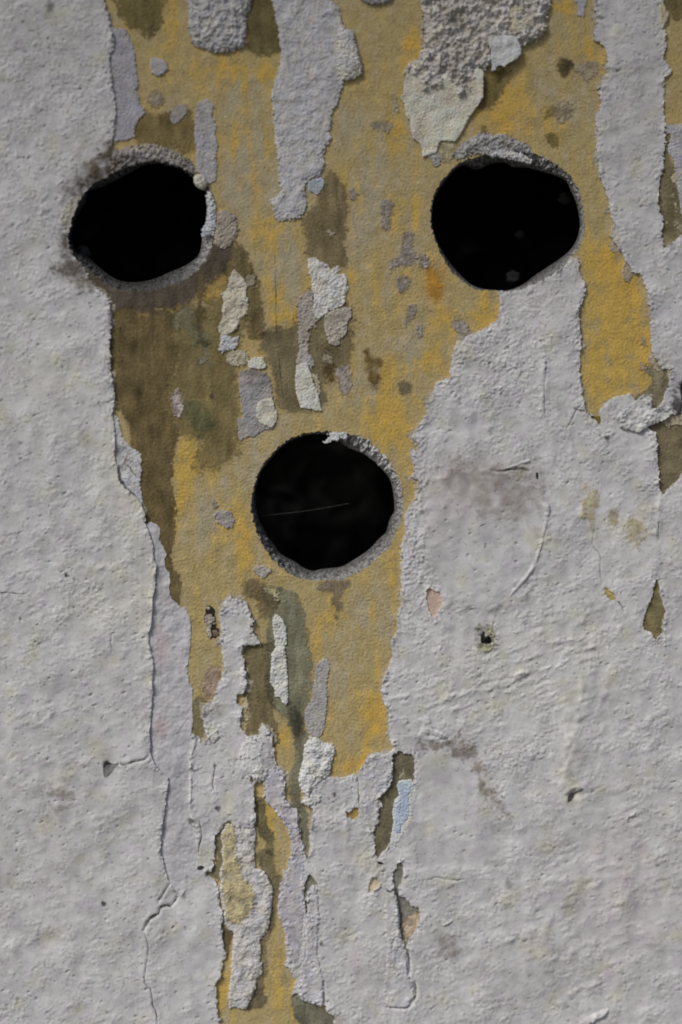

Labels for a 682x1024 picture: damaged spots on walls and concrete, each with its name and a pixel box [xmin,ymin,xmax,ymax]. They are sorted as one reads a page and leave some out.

crack [115,445,140,501]
peeling [92,0,682,897]
crack [144,885,178,1020]
peeling [205,749,335,1024]
peeling [368,862,420,1008]